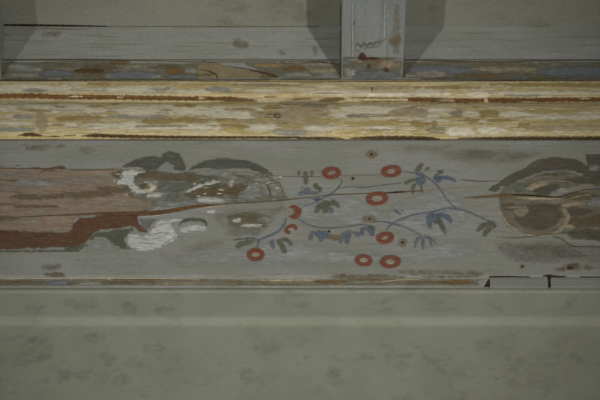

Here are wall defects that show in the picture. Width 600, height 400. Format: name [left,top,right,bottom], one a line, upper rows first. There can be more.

peeling [0,5,600,137]
crack [12,193,371,218]
crack [388,179,595,208]